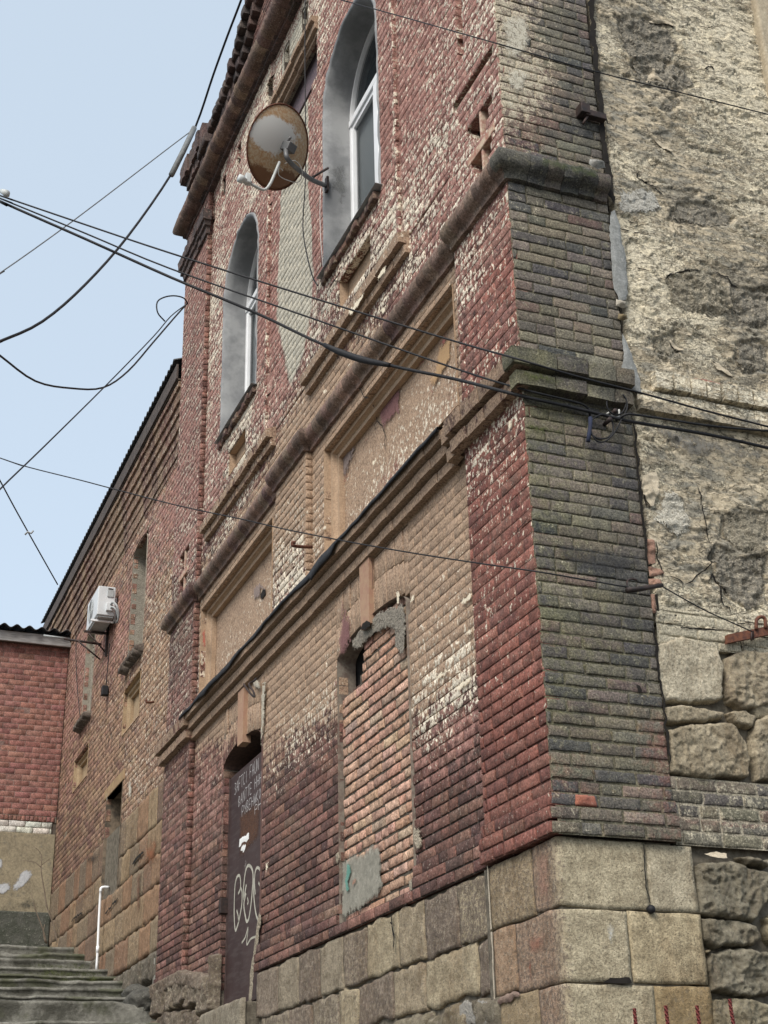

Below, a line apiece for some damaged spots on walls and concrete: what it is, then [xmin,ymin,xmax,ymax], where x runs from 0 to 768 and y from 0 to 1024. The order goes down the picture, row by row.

flaking render [618,16,694,111]
peeling [339,601,370,653]
crack [632,418,753,768]